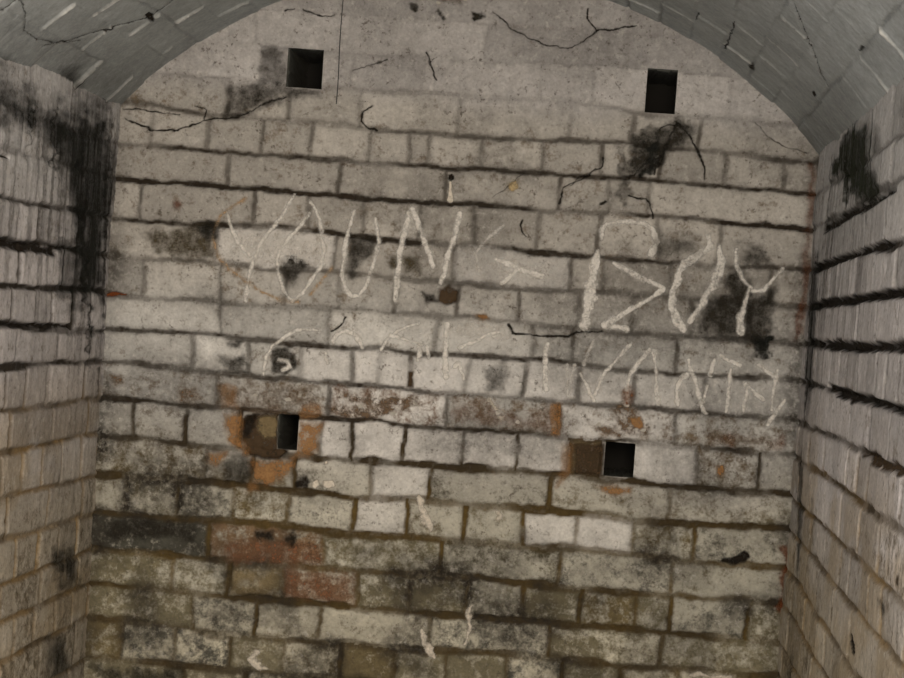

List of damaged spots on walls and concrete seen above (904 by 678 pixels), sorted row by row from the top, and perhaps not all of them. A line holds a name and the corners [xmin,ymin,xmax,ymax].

crack [493,8,637,49]
crack [124,97,286,132]
water stain [829,124,880,204]
water stain [0,82,113,354]
crack [507,323,603,338]
water stain [110,520,193,542]